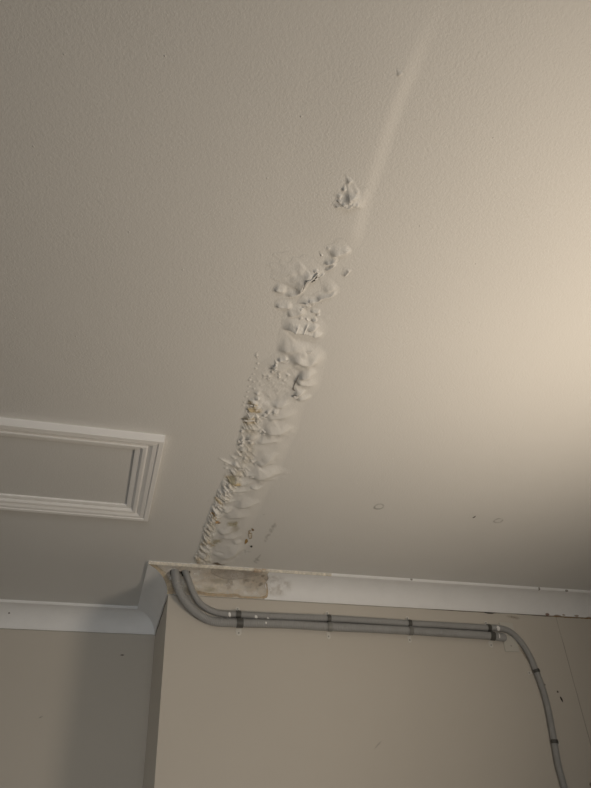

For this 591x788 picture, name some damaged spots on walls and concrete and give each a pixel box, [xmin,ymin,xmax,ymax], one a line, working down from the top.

water stain [149,557,332,599]